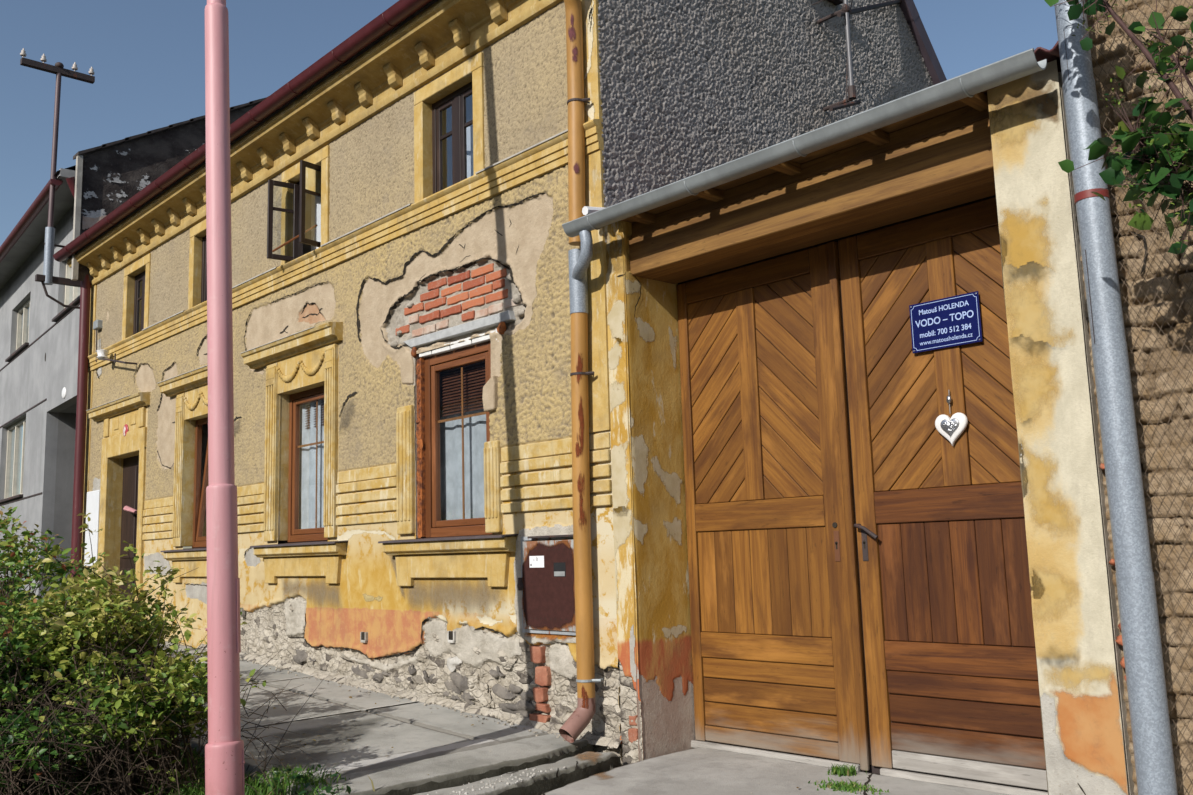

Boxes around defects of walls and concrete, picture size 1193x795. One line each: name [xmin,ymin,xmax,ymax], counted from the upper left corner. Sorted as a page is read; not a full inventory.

flaking render [82,165,150,230]
flaking render [197,335,208,365]
flaking render [244,281,336,351]
flaking render [356,192,554,412]
peeling [607,278,655,412]
flaking render [134,361,178,470]
peeling [611,416,682,614]
peeling [435,524,576,723]
peeling [1040,693,1127,795]